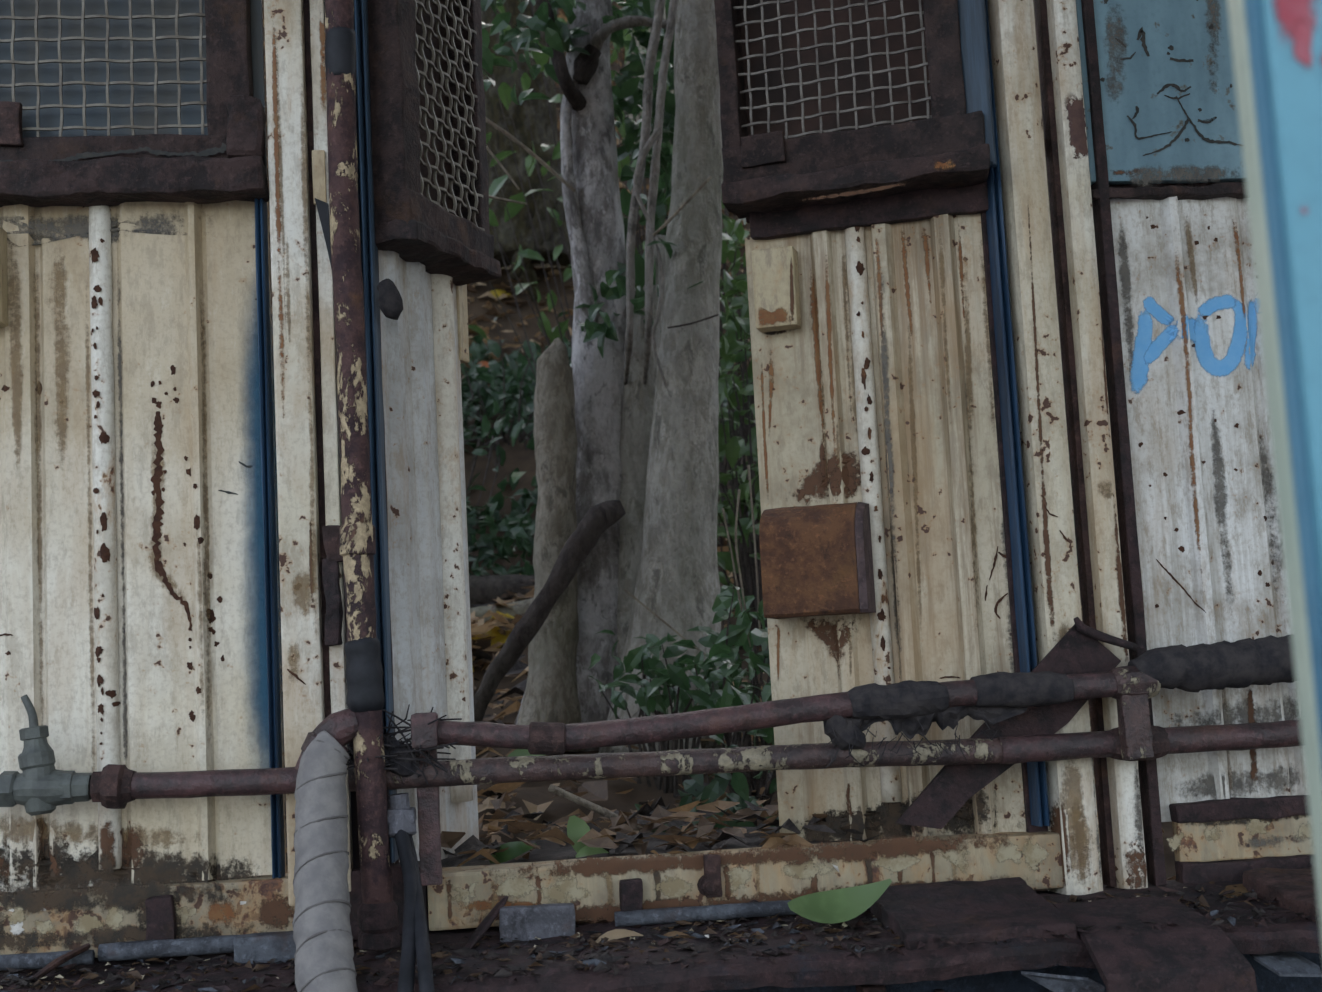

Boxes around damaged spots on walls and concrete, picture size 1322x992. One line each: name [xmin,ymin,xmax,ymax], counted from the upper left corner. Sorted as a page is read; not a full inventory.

corrosion [758,258,794,335]
corrosion [792,257,861,505]
corrosion [761,359,774,493]
corrosion [183,515,225,661]
corrosion [806,618,857,676]
corrosion [0,817,172,875]
peeling [495,876,589,903]
peeling [654,875,692,901]
peeling [726,867,752,893]
peeling [871,854,921,872]
peeling [1166,832,1184,851]
peeling [1246,819,1270,835]